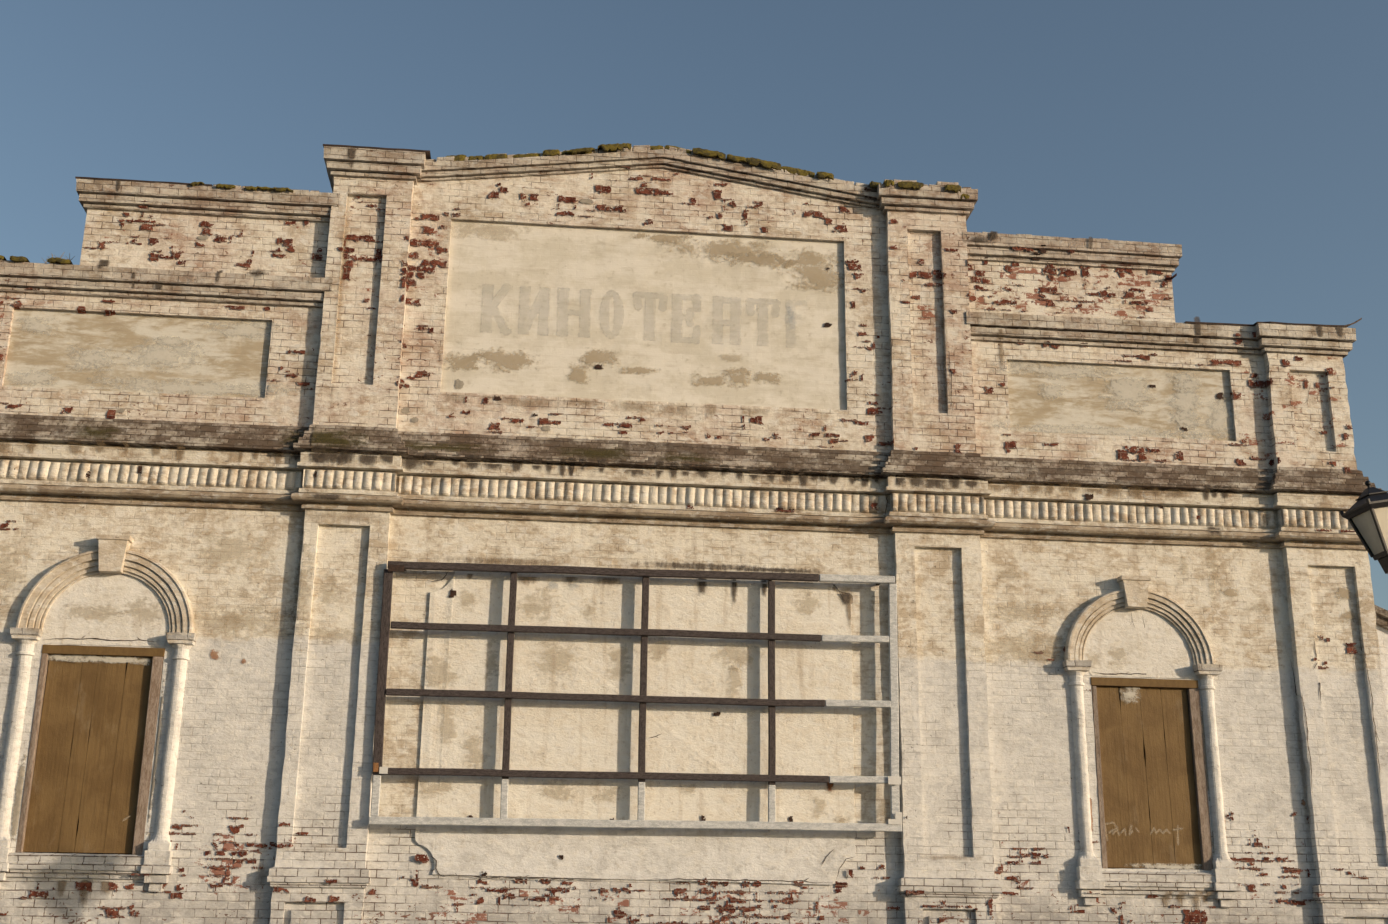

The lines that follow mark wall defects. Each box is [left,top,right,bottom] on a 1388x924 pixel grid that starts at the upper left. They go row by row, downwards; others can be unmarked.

spalling [85,200,243,265]
spalling [236,221,309,270]
spalling [312,234,384,281]
spalling [401,207,461,306]
spalling [944,245,1177,318]
damp [152,444,184,459]
damp [239,446,606,476]
damp [627,461,1181,497]
spalling [75,867,187,918]
spalling [399,854,443,889]
spalling [835,864,890,893]
spalling [1230,830,1314,908]